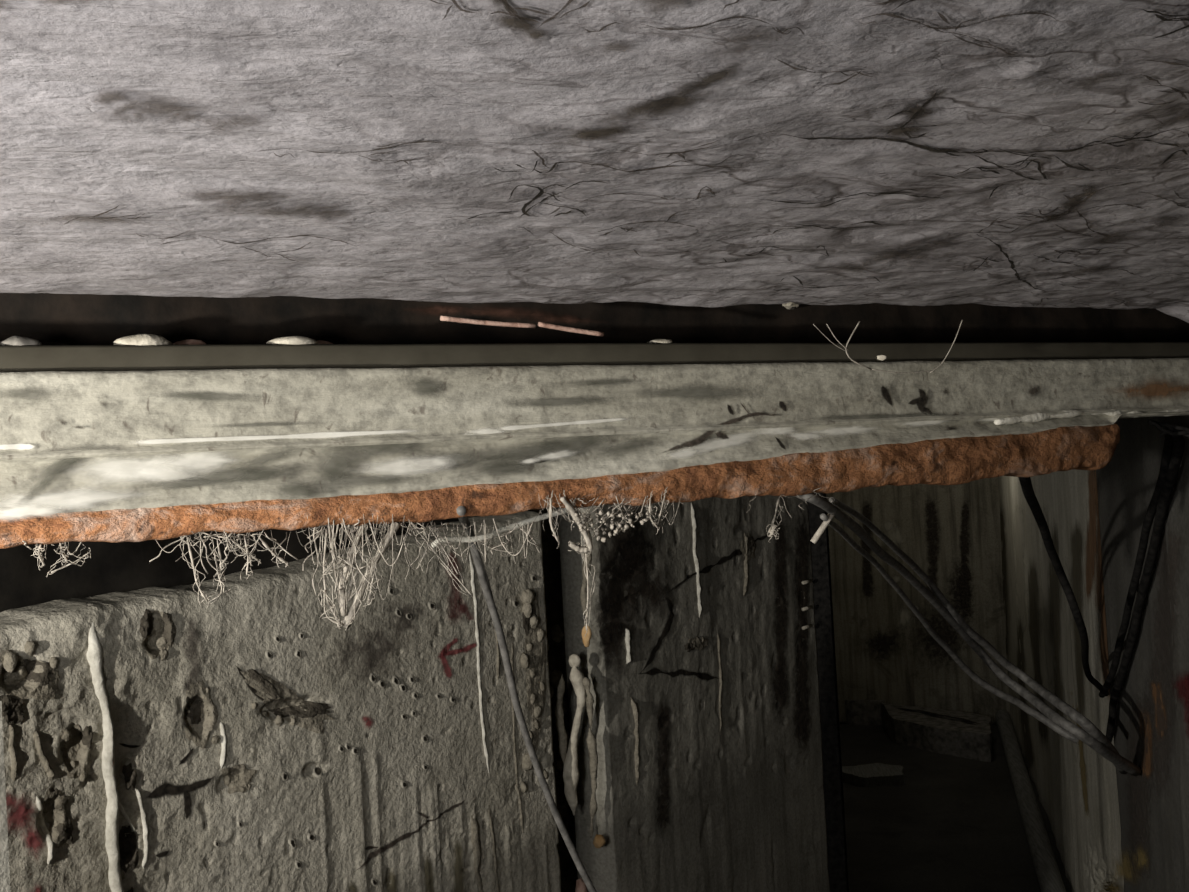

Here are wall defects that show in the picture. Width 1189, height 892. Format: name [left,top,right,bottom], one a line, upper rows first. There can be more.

crack [430,0,873,93]
crack [856,0,1057,55]
crack [262,141,450,165]
crack [466,10,1189,307]
spalling [139,609,175,661]
water stain [594,518,671,666]
water stain [773,519,811,748]
spalling [0,641,60,725]
spalling [59,724,93,783]
water stain [555,666,598,838]
water stain [656,701,670,829]
spalling [119,825,139,892]